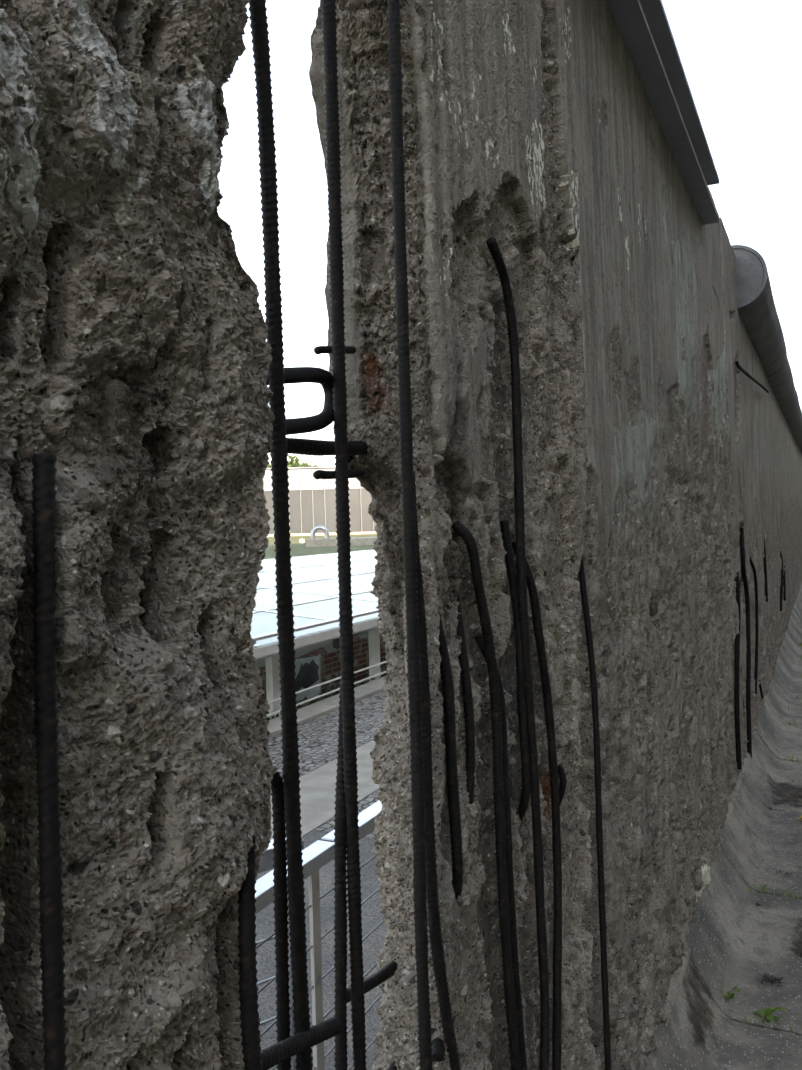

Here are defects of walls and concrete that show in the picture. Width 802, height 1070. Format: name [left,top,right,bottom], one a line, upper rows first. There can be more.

flaking render [0,9,53,275]
flaking render [45,0,149,197]
flaking render [154,75,226,245]
spalling [31,453,68,1070]
spalling [237,0,398,1070]
spalling [360,0,581,1070]
spalling [578,554,611,1070]